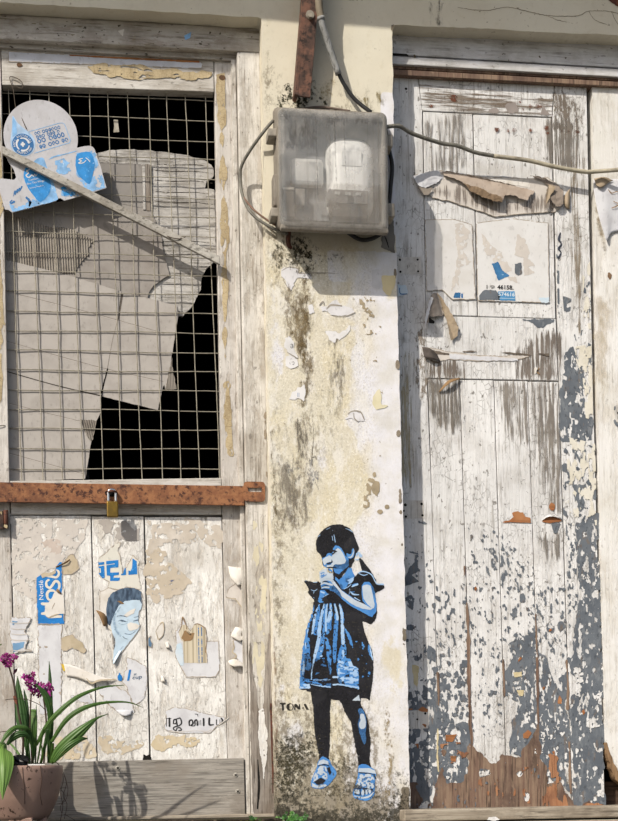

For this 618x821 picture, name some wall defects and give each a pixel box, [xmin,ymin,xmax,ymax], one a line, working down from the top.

peeling [88,63,230,358]
damp [272,236,317,283]
flaking render [281,266,337,290]
flaking render [381,269,397,296]
damp [284,287,313,406]
flaking render [308,296,381,344]
peeling [223,381,234,456]
damp [295,422,319,488]
peeling [395,84,606,810]
damp [273,465,308,525]
peeling [98,519,119,535]